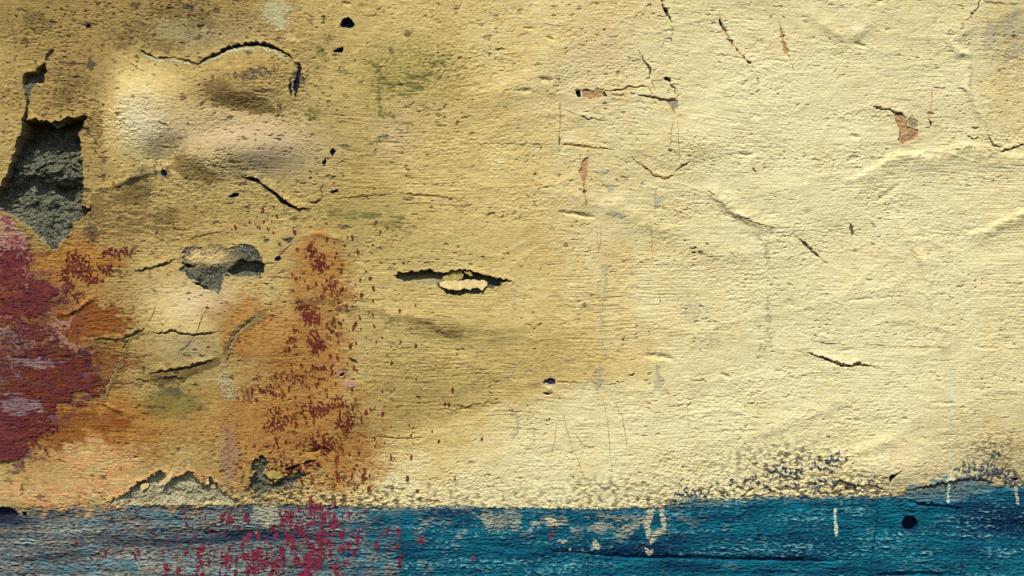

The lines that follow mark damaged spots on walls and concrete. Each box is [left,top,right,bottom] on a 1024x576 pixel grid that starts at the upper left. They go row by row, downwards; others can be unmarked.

crack [142,41,302,97]
crack [460,0,688,180]
spalling [0,49,92,250]
spalling [875,107,919,145]
crack [233,176,460,210]
spalling [179,237,298,295]
spalling [393,269,511,296]
corrosion [0,232,223,517]
crack [95,304,255,412]
corrosion [215,228,389,490]
crack [797,339,944,368]
peeling [105,455,307,518]